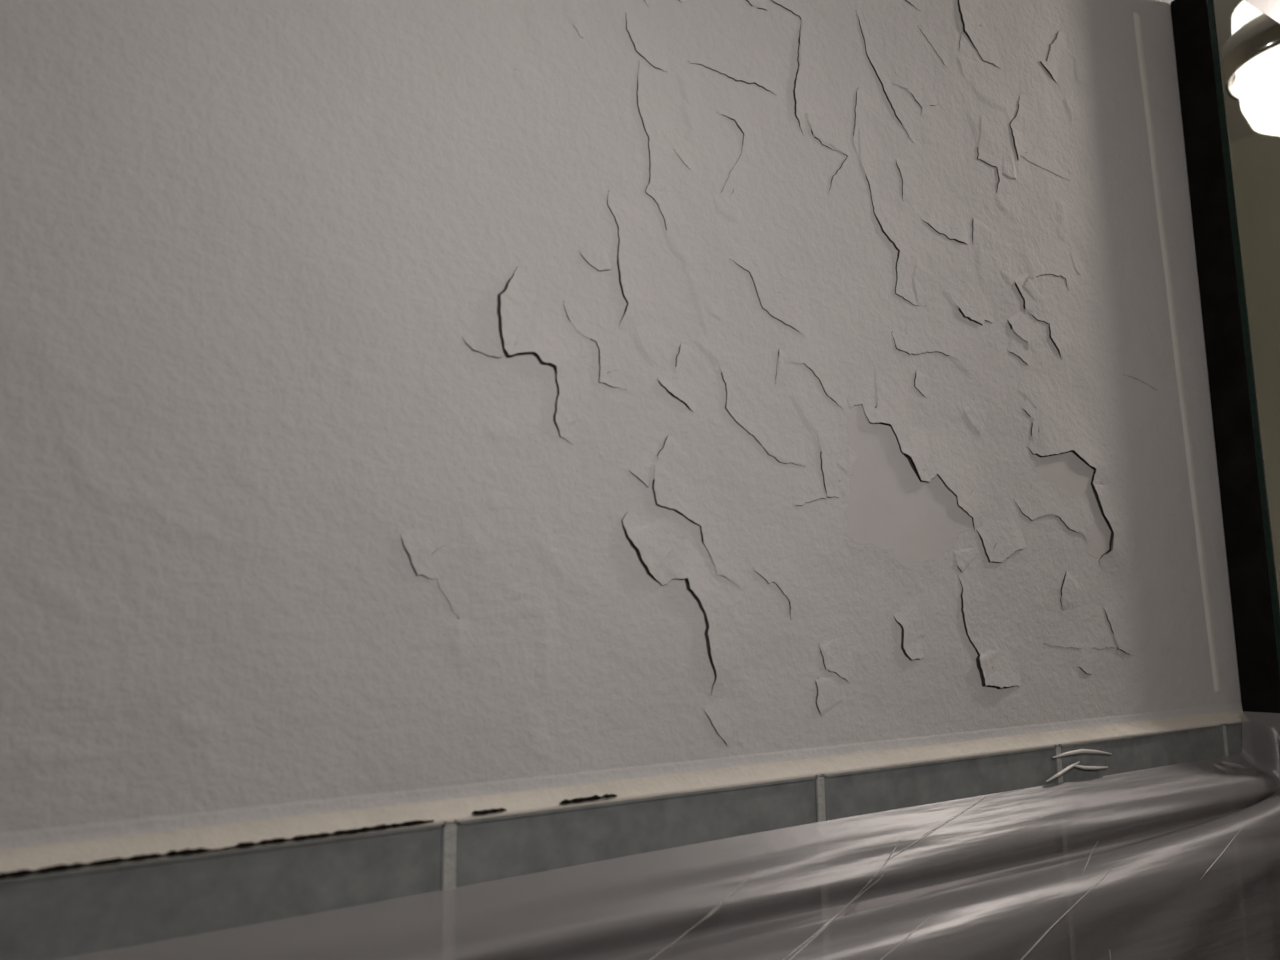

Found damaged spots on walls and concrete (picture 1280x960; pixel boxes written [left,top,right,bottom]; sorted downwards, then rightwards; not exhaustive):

peeling [687,0,833,137]
peeling [853,0,1002,307]
peeling [977,92,1069,202]
peeling [579,191,658,335]
peeling [462,266,593,445]
flaking render [716,234,1142,585]
peeling [621,446,754,746]